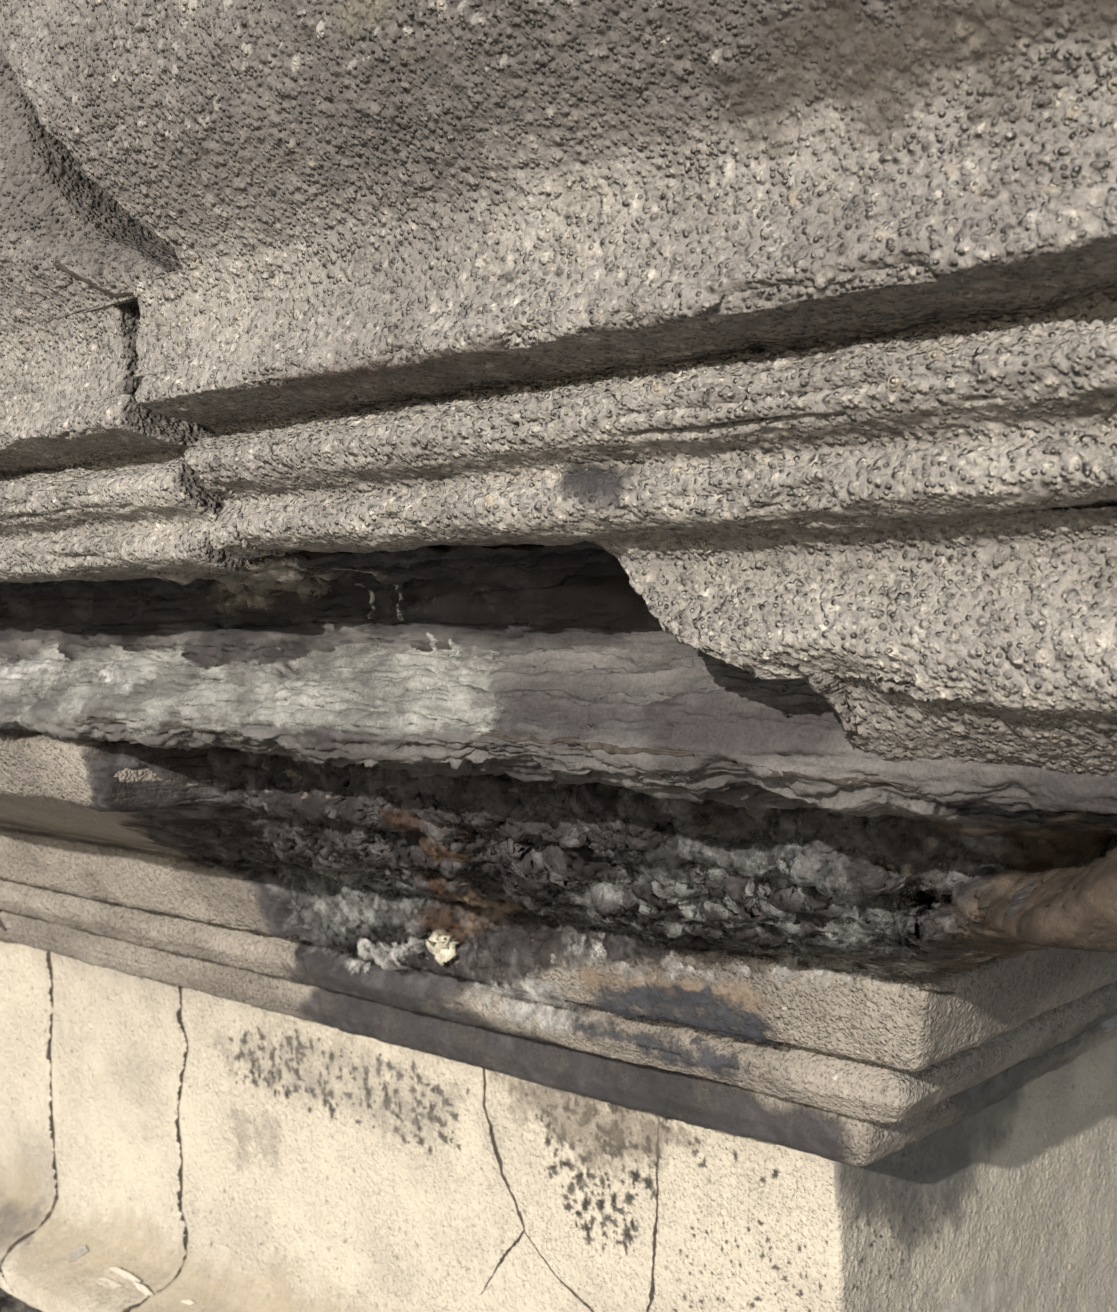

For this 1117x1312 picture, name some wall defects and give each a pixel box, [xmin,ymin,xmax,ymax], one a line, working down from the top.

crack [53,260,134,297]
spalling [84,740,1099,986]
crack [0,951,59,1290]
crack [122,986,189,1312]
leakage [228,1028,469,1154]
leakage [467,980,582,1031]
crack [480,1069,594,1312]
leakage [510,1082,706,1259]
crack [646,1129,660,1312]
leakage [672,1221,826,1312]
leakage [834,1014,1110,1309]